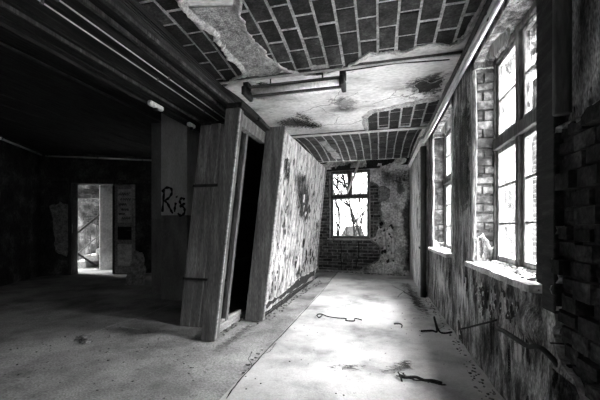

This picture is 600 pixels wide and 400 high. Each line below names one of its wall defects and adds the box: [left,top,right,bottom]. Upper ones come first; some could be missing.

leakage [279,113,322,130]
spalling [136,0,486,89]
spalling [294,77,445,162]
leakage [405,71,445,98]
spalling [471,27,510,261]
leakage [283,157,310,223]
spalling [265,171,405,317]
leakage [436,259,475,323]
flaking render [549,100,600,400]
leakage [506,333,526,381]